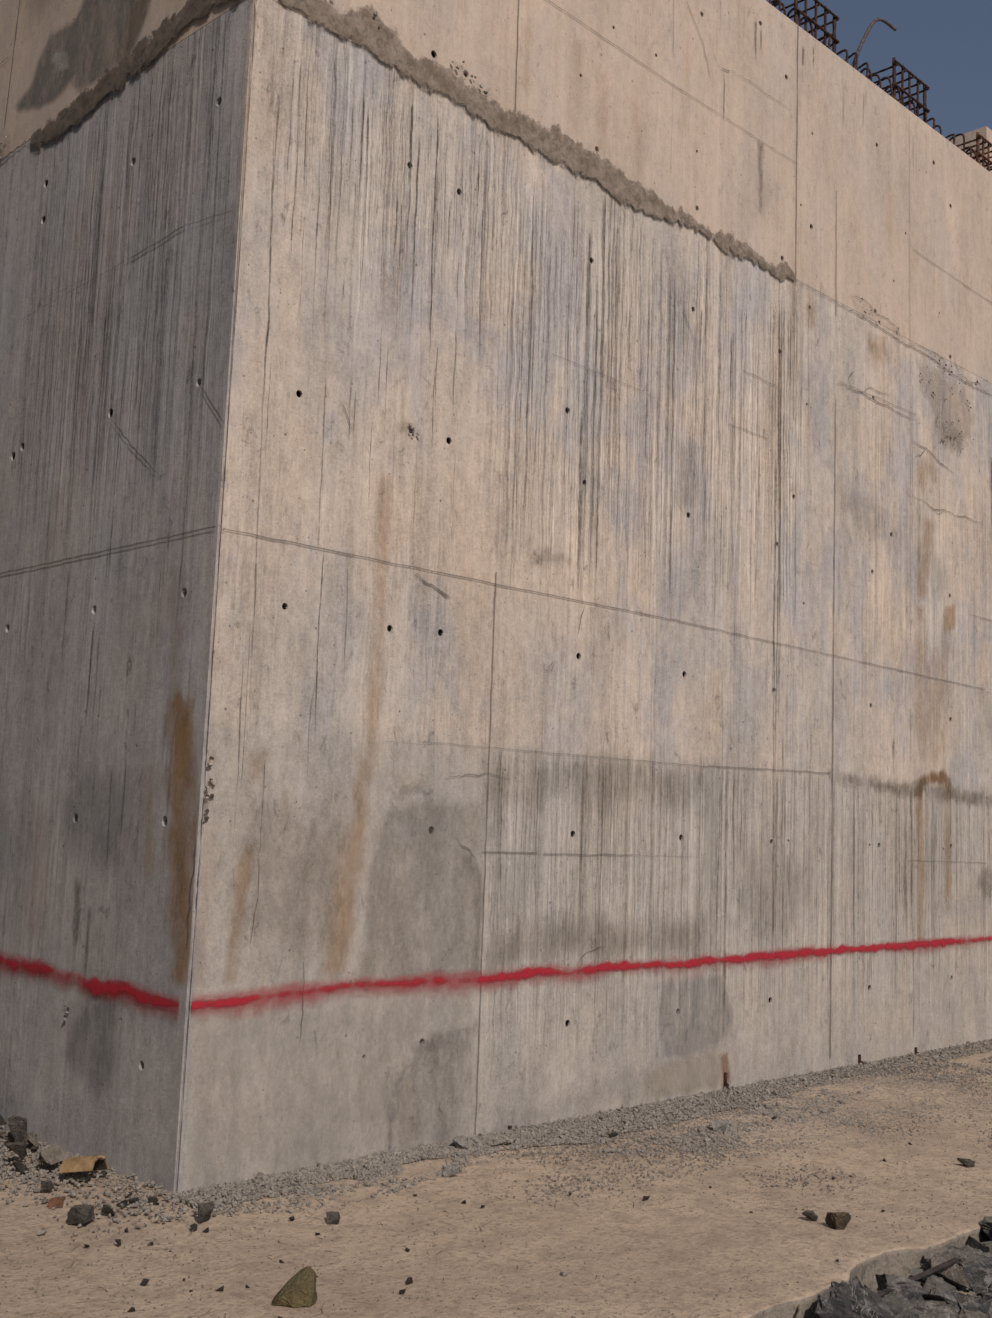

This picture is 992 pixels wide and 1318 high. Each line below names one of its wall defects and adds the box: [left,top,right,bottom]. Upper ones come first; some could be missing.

water stain [19,0,146,109]
crack [797,281,990,395]
corrosion [916,772,953,796]